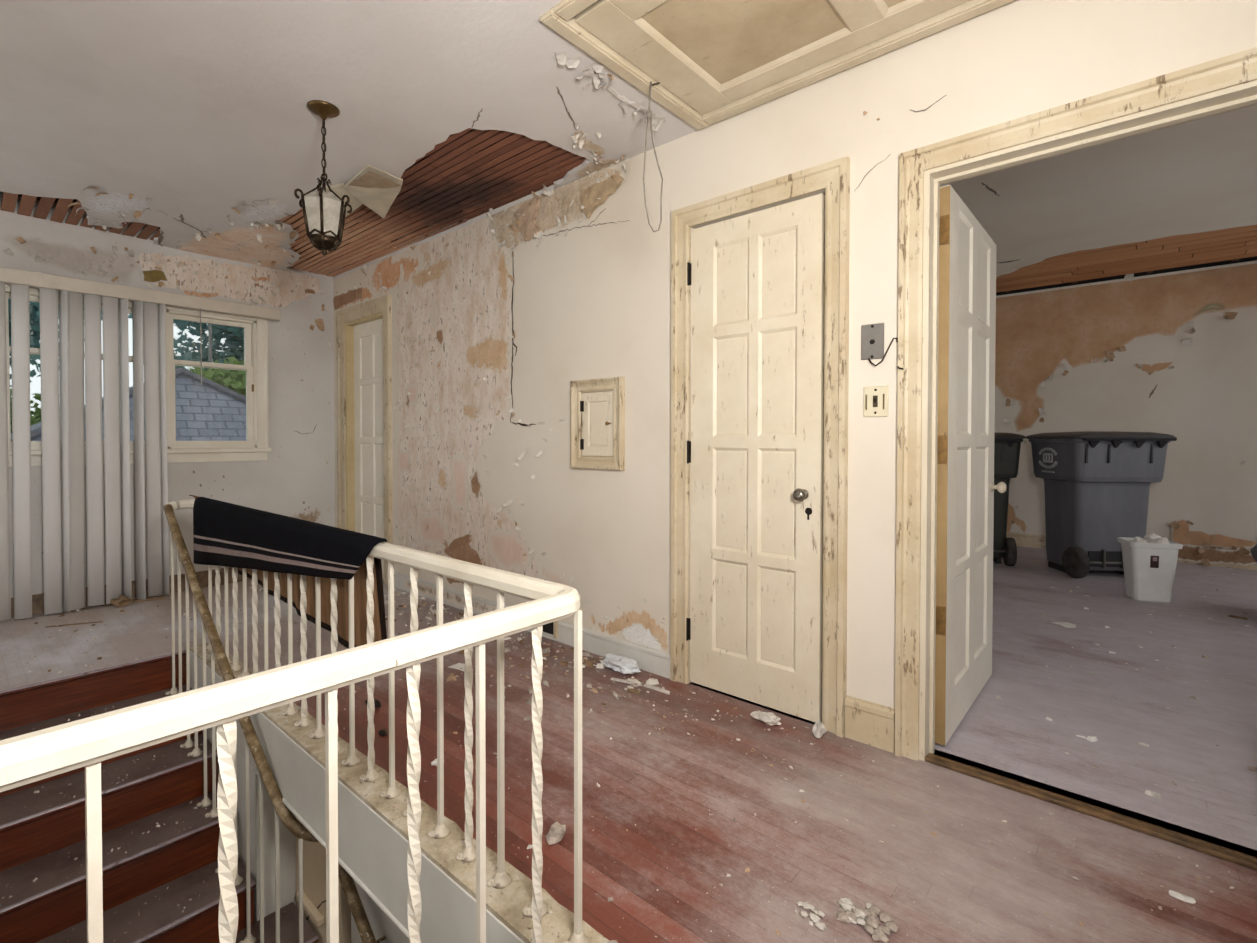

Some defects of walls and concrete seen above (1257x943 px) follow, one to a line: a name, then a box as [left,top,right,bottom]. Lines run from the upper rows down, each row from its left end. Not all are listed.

peeling [554,52,666,131]
peeling [68,186,168,230]
peeling [135,125,670,653]
crack [510,208,629,427]
flaking render [995,263,1257,443]
flaking render [1169,519,1257,566]